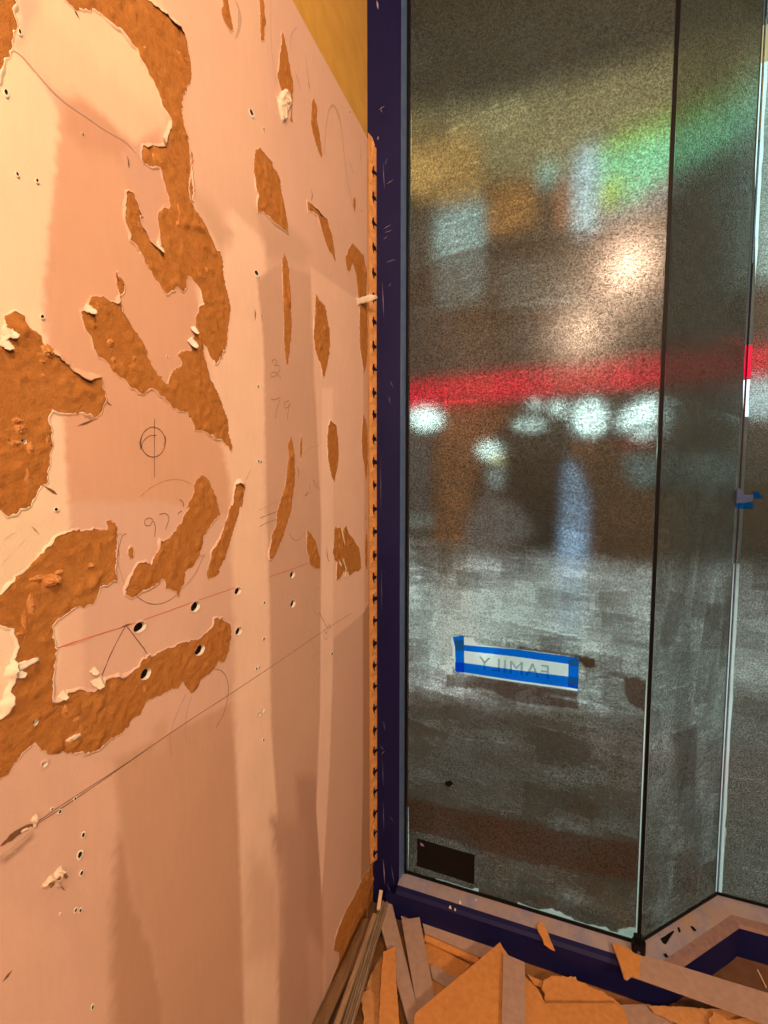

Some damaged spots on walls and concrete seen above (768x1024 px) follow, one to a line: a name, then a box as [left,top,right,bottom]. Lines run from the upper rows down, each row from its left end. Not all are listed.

peeling [277,30,294,123]
peeling [310,98,322,158]
peeling [253,147,289,235]
peeling [0,0,234,519]
peeling [306,199,368,378]
peeling [326,419,339,482]
peeling [268,435,303,561]
peeling [306,525,368,582]
peeling [0,474,246,780]